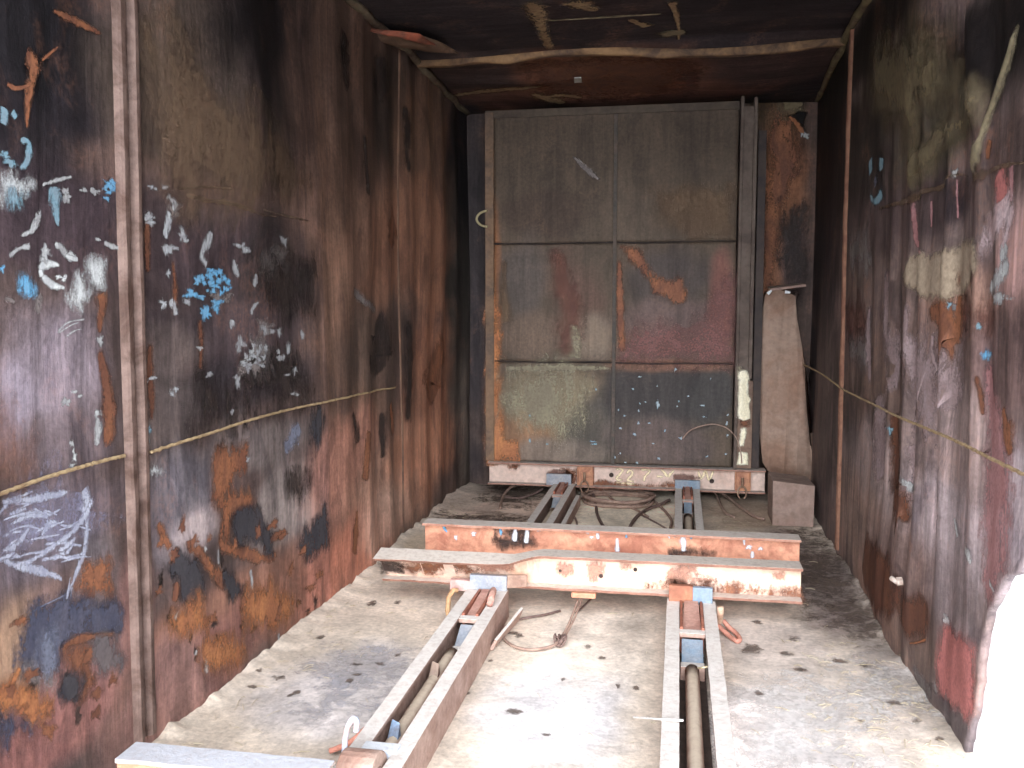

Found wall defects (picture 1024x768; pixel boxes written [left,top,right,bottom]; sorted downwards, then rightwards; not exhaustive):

rust [7,46,58,127]
rust [763,102,805,298]
rust [620,245,687,304]
rust [97,350,117,446]
rust [483,294,520,470]
peeling [170,547,206,604]
rust [155,442,294,674]
peeling [222,568,246,605]
peeling [231,503,274,558]
peeling [299,502,330,563]
peeling [12,591,125,706]
rust [0,667,57,741]